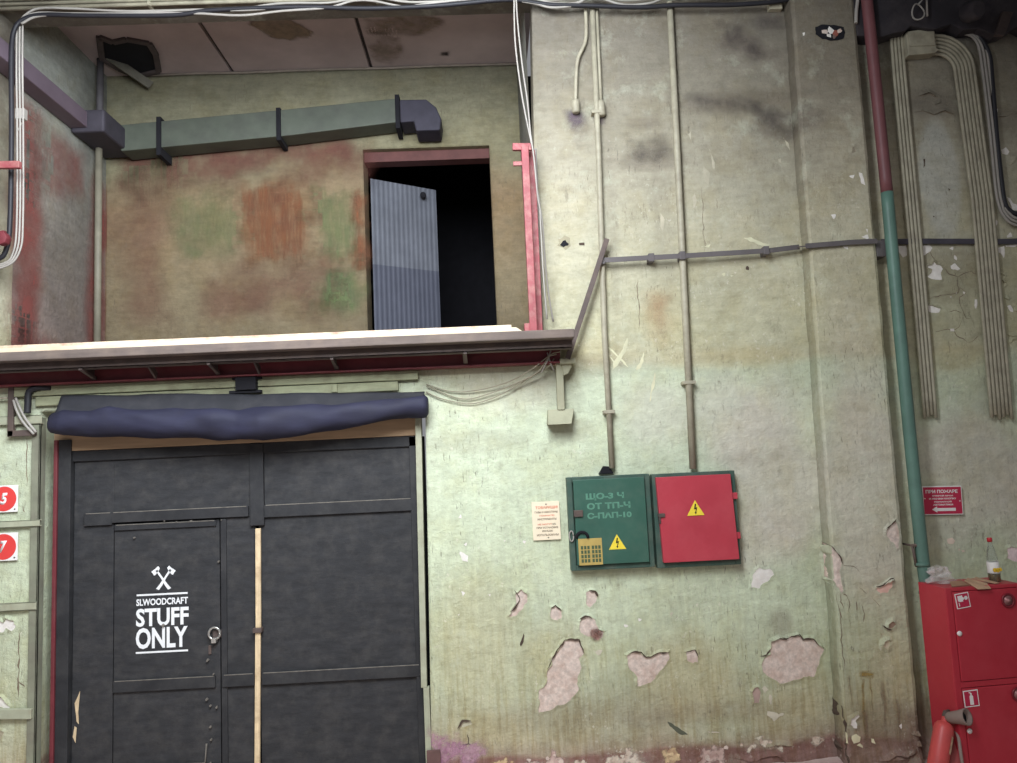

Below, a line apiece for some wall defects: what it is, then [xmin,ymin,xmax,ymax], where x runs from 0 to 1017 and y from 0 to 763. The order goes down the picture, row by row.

damp [250,20,311,40]
spalling [96,35,162,77]
crack [911,89,957,117]
crack [928,252,978,343]
peeling [0,614,19,635]
flaking render [535,588,607,717]
flaking render [624,646,700,689]
flaking render [749,632,826,721]
peeling [526,750,586,763]
peeling [606,748,645,763]
peeling [662,748,681,763]
peeling [698,745,728,763]